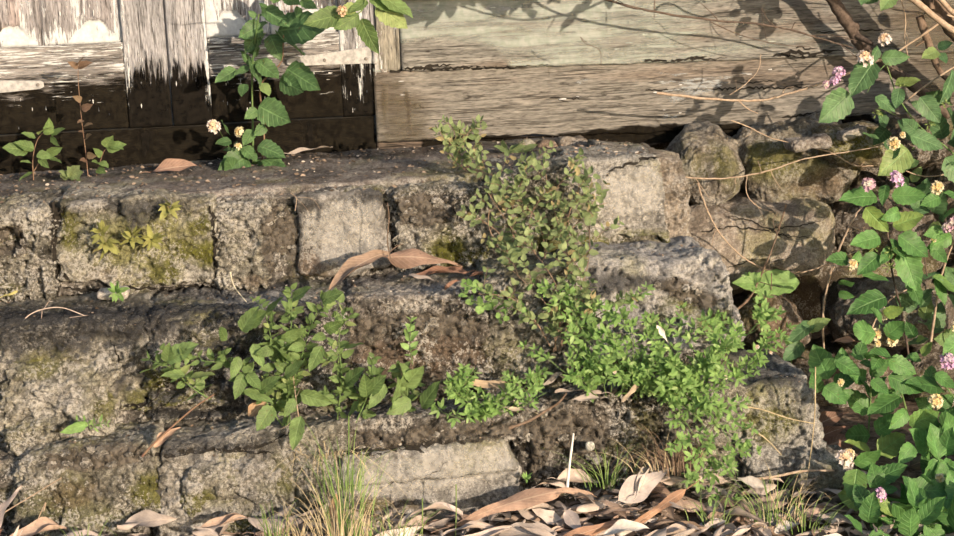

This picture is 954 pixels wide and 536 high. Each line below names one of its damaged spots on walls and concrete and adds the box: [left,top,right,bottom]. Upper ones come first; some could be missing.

peeling [0,0,144,97]
crack [702,216,826,268]